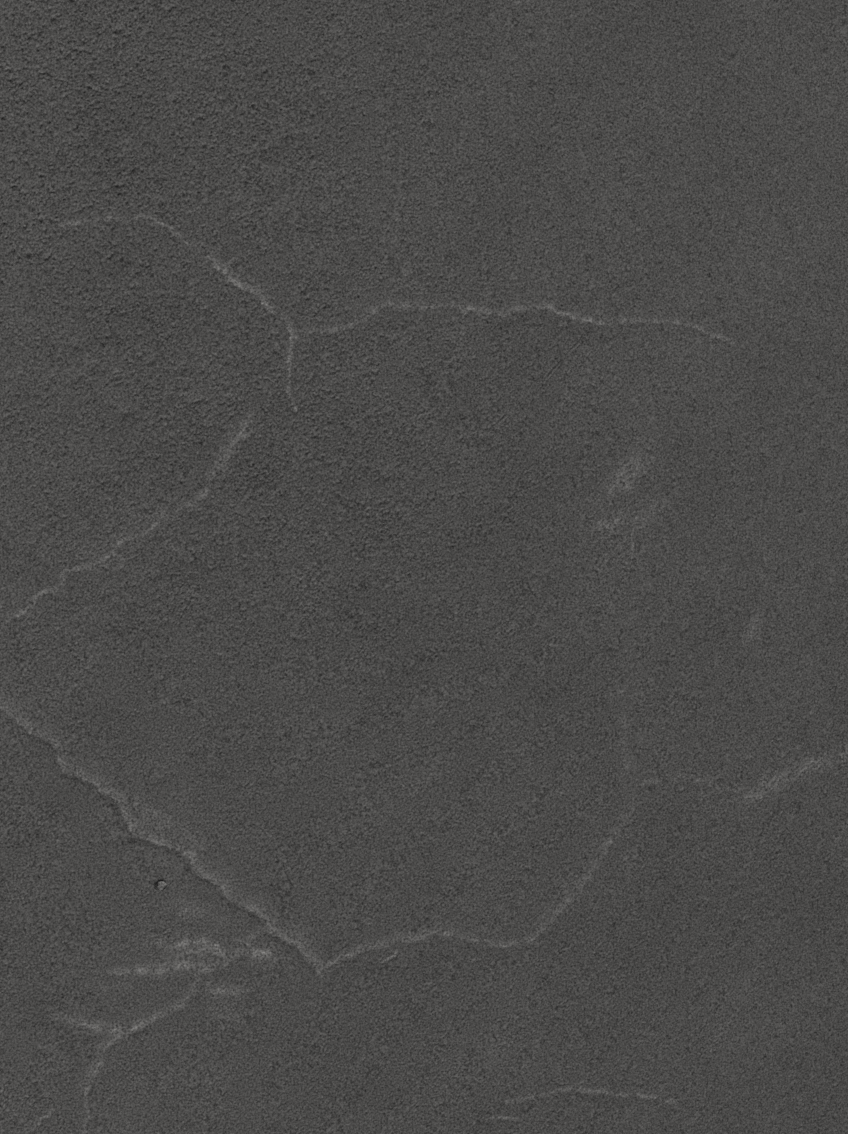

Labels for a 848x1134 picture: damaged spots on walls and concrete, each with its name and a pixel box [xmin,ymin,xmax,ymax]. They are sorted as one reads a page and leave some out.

crack [53,212,740,418]
crack [499,1084,684,1109]